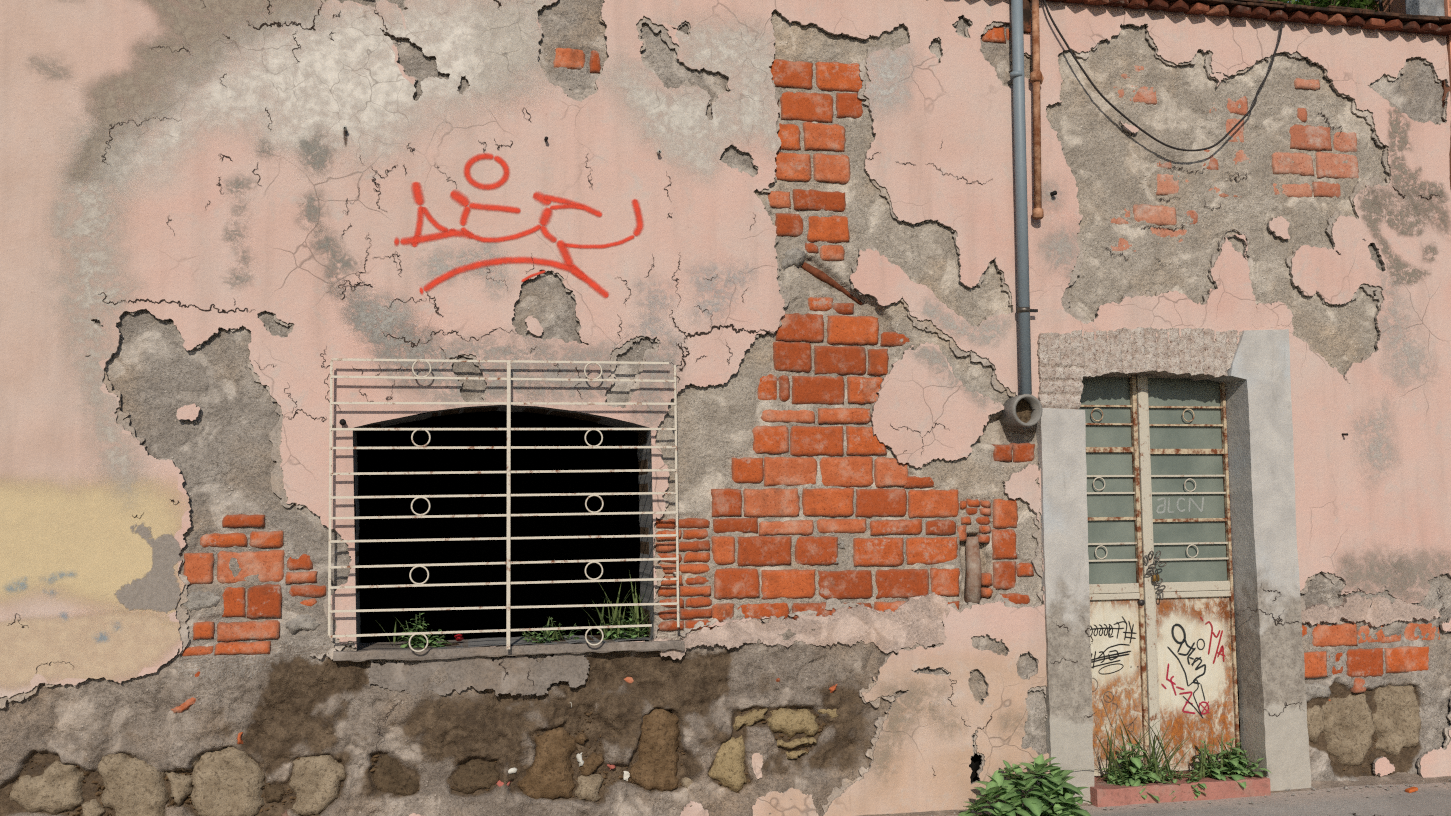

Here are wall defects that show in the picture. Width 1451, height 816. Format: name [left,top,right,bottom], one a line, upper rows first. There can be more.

crack [226,0,400,62]
crack [478,108,531,152]
spalling [1369,58,1444,125]
crack [205,155,261,207]
spalling [1046,25,1389,375]
crack [98,292,254,313]
crack [254,143,581,422]
spalling [0,0,1047,816]
rust [1156,598,1231,651]
rust [1092,673,1141,761]
rust [1160,670,1233,765]
spalling [1300,572,1451,781]